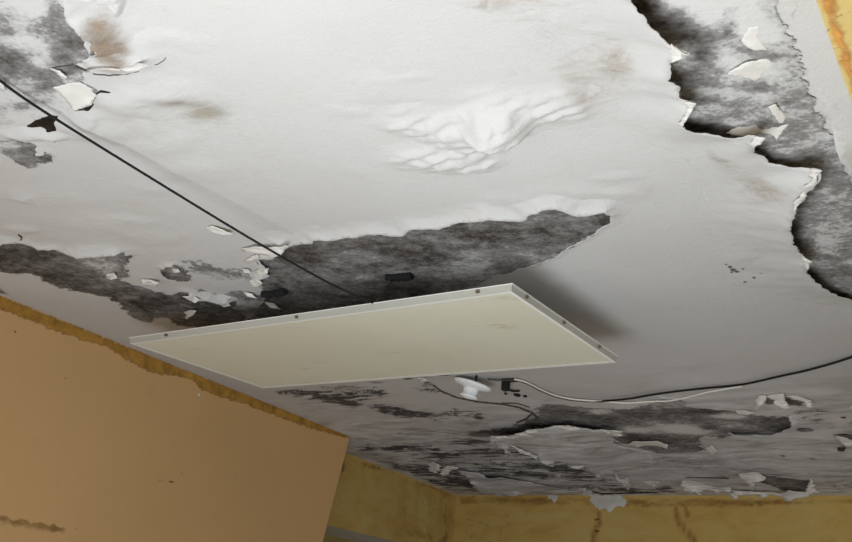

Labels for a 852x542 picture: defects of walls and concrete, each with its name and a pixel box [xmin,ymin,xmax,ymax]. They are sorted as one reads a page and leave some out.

peeling [0,0,152,126]
peeling [0,140,59,169]
peeling [508,0,852,308]
peeling [426,393,820,512]
peeling [833,434,852,452]